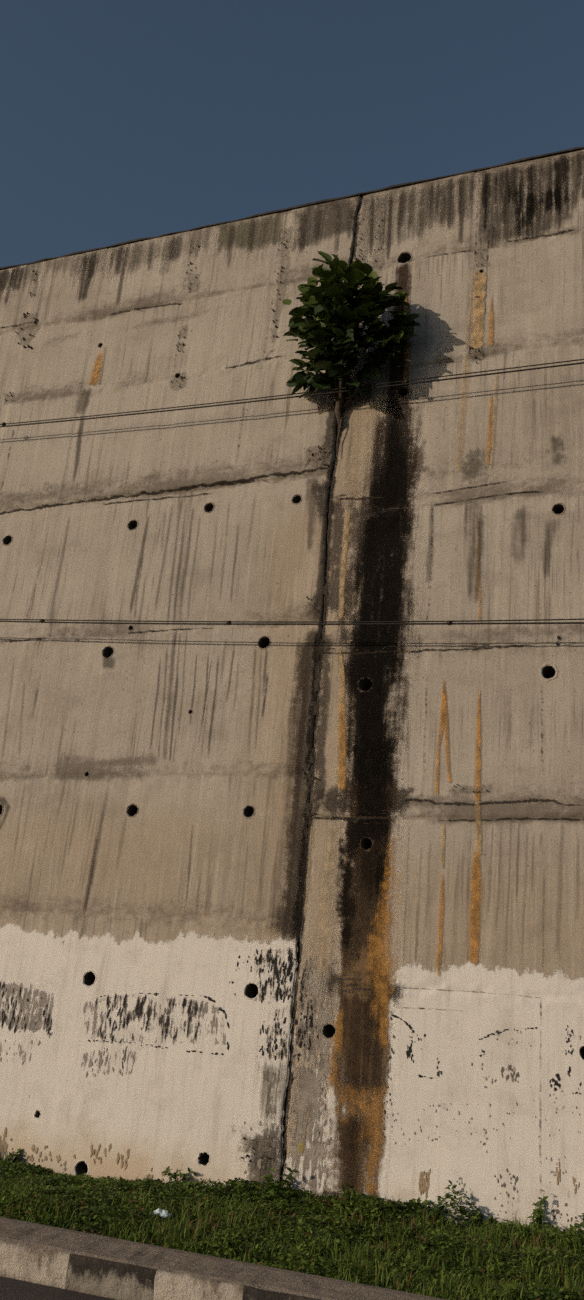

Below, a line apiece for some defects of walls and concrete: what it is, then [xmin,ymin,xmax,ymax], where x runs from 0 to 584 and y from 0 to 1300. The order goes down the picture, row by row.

leakage [78,255,95,300]
crack [348,196,364,282]
leakage [370,199,411,319]
corrosion [471,271,493,349]
leakage [478,153,584,245]
crack [0,400,544,1186]
leakage [280,344,417,1199]
corrosion [435,682,451,794]
corrosion [470,692,481,963]
peeling [0,981,53,1064]
peeling [81,993,229,1077]
peeling [237,948,338,1195]